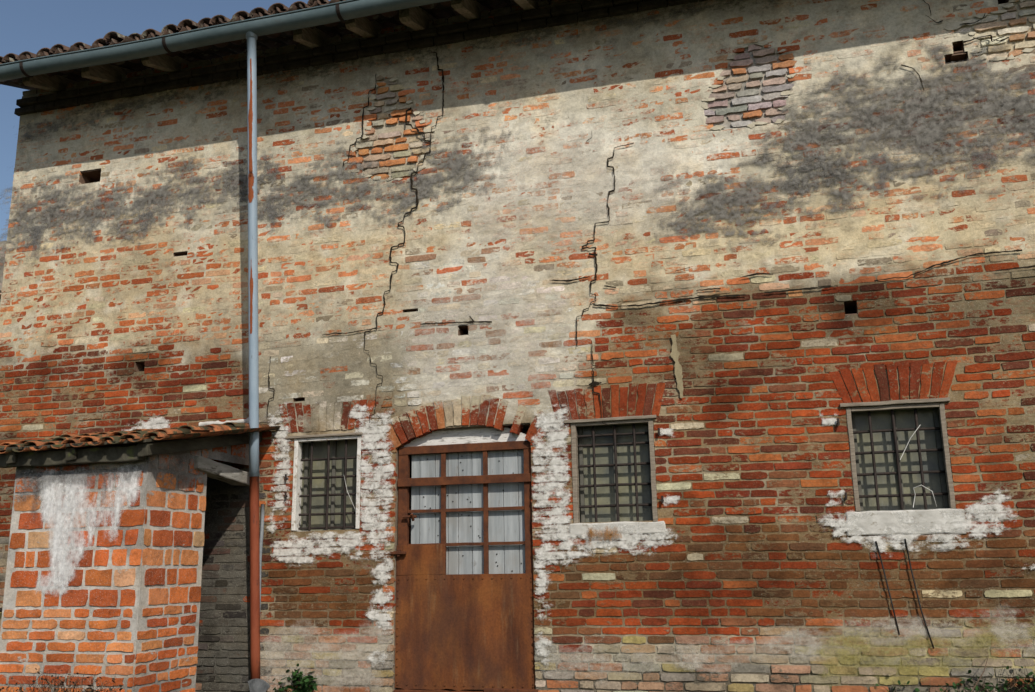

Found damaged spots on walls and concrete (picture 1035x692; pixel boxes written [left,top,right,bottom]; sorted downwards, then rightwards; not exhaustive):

damp [0,127,511,262]
crack [323,51,444,423]
spalling [342,78,437,182]
crack [551,142,838,425]
spalling [701,41,797,131]
damp [658,40,1035,244]
crack [874,249,1035,282]
spalling [944,0,1035,61]
damp [21,465,140,594]
peeling [267,404,394,634]
peeling [532,404,677,618]
peeling [820,490,1016,552]